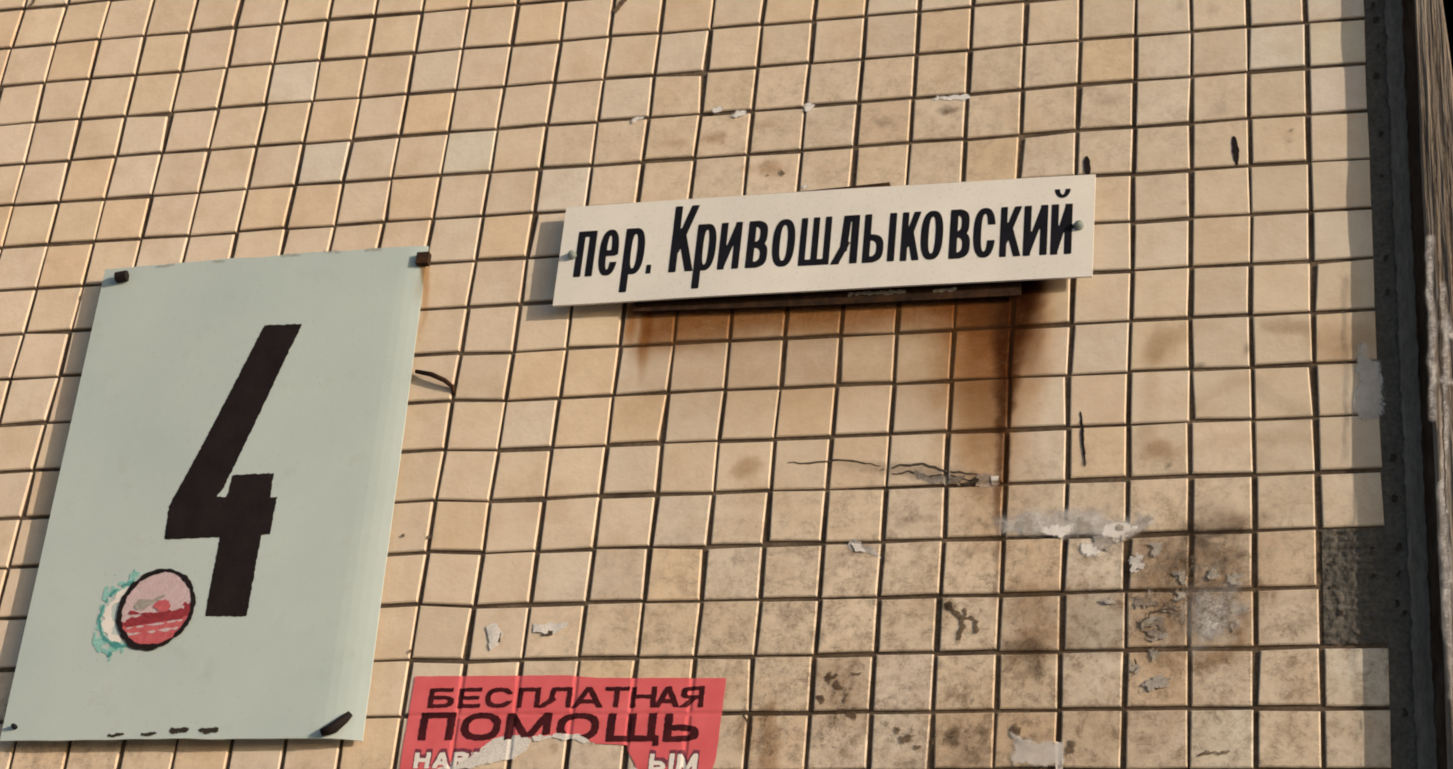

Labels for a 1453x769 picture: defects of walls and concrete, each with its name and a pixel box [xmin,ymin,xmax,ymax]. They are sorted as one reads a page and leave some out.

corrosion [996,280,1041,479]